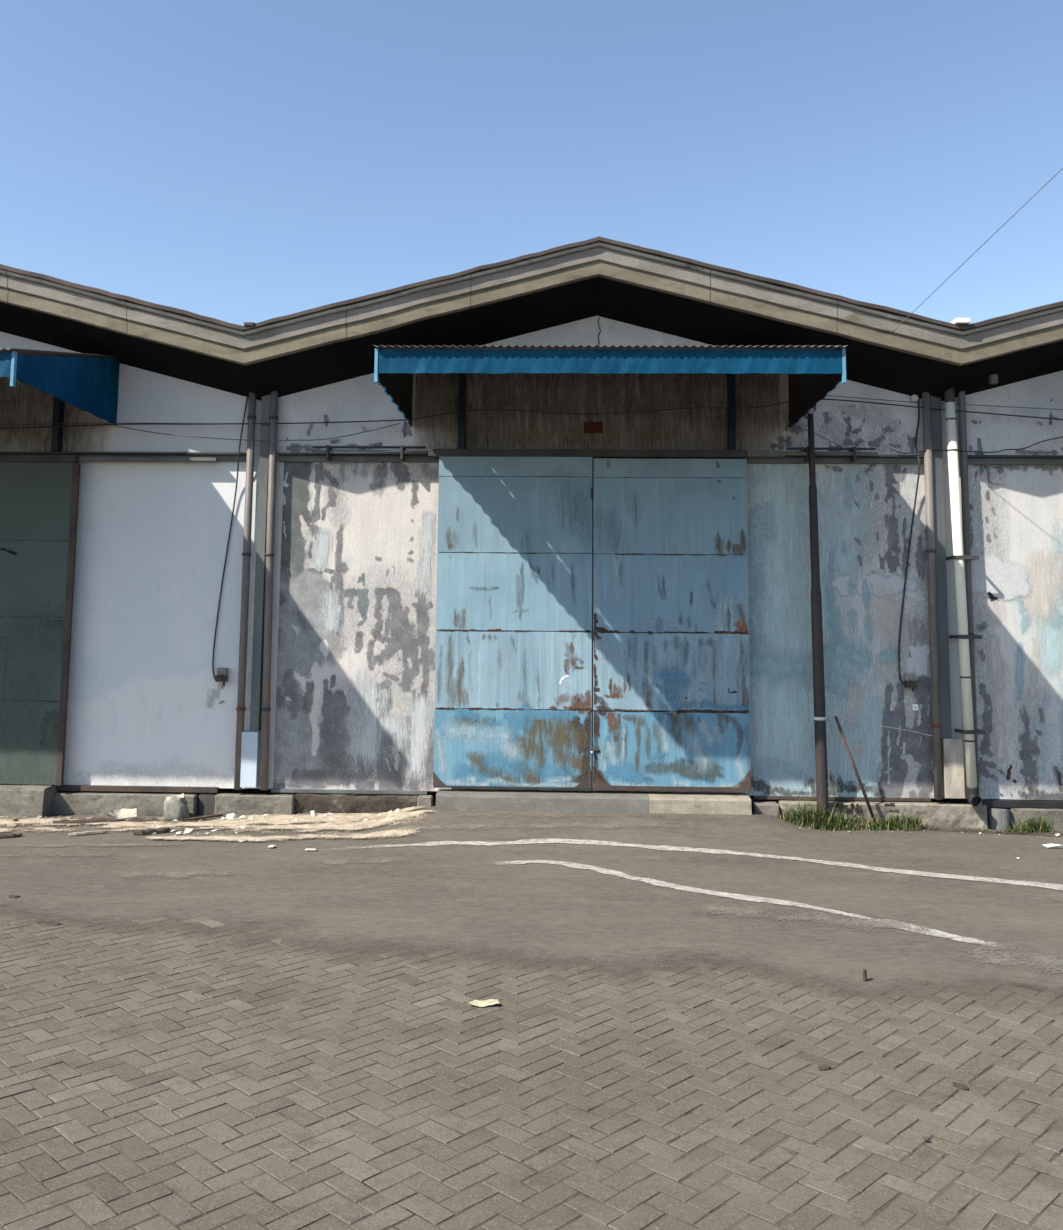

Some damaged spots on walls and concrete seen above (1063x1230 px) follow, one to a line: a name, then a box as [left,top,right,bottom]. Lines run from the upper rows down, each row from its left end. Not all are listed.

peeling [823,412,915,472]
peeling [854,464,927,580]
peeling [969,420,1004,547]
peeling [280,415,436,814]
rust [439,611,749,787]
spalling [832,803,863,820]
peeling [879,675,934,807]
peeling [978,683,1005,781]
peeling [1018,706,1045,791]
peeling [1054,766,1063,790]